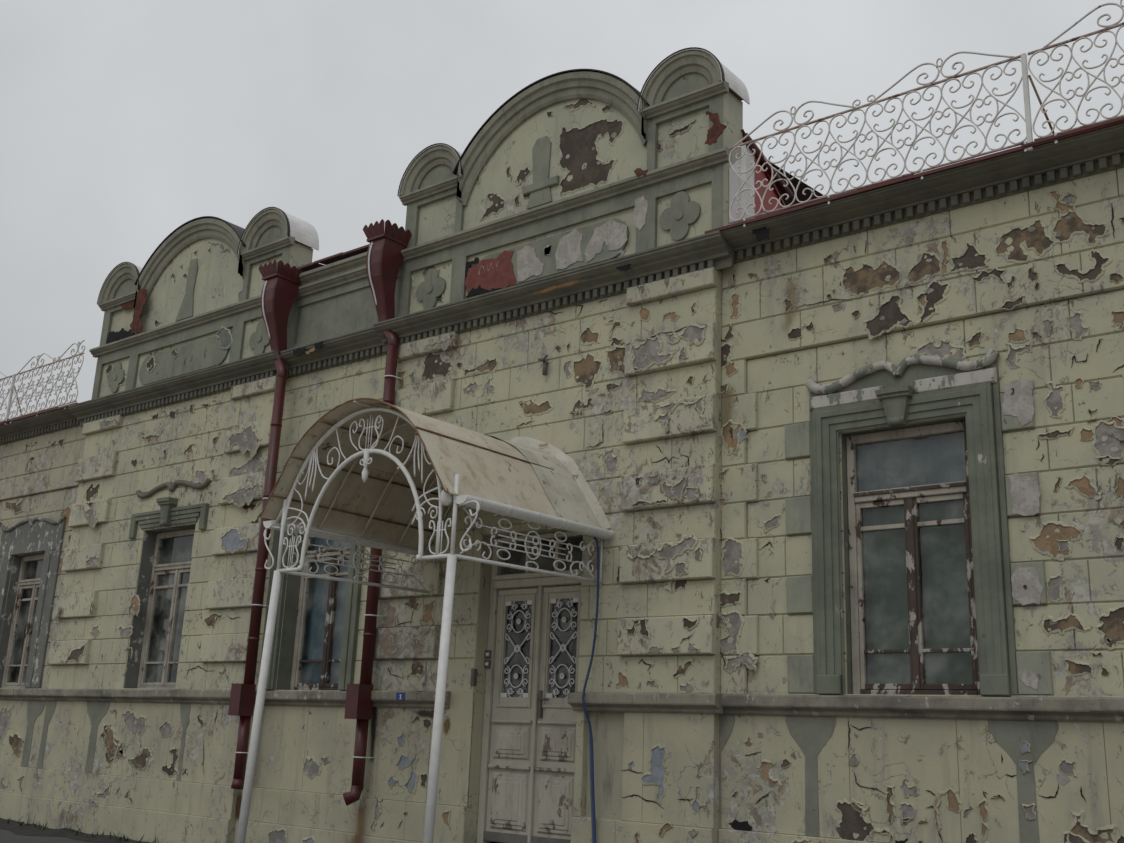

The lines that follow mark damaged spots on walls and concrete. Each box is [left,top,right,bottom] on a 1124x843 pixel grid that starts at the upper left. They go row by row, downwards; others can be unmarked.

spalling [547,99,625,195]
flaking render [465,196,648,298]
spalling [784,190,1124,361]
peeling [555,303,707,434]
peeling [721,272,759,394]
peeling [586,410,619,474]
peeling [632,474,699,508]
peeling [720,414,748,510]
peeling [759,514,781,550]
spalling [1002,311,1124,678]
spalling [835,753,1004,843]
spalling [1021,759,1124,843]